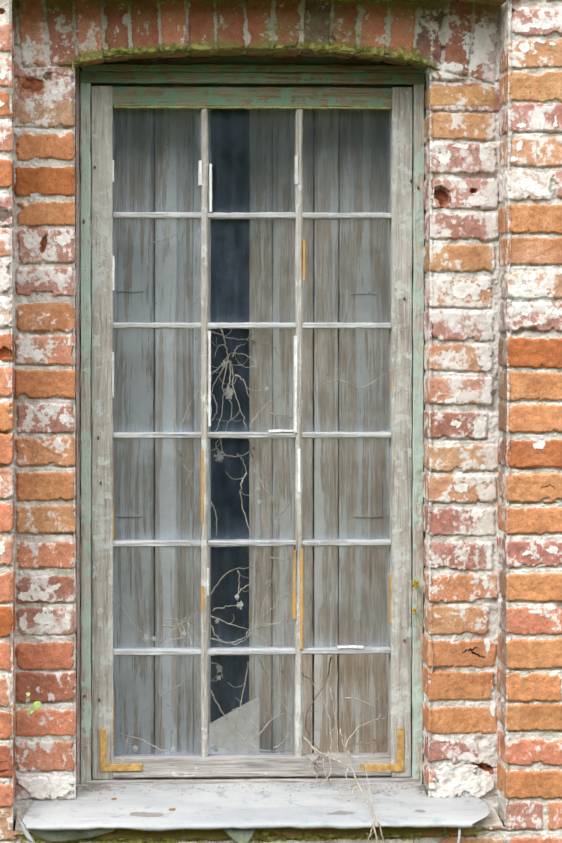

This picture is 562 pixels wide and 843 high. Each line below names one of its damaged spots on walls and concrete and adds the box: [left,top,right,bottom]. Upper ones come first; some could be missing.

peeling [20,35,66,95]
spalling [434,187,451,208]
peeling [458,179,489,206]
peeling [0,336,44,365]
spalling [478,762,494,792]